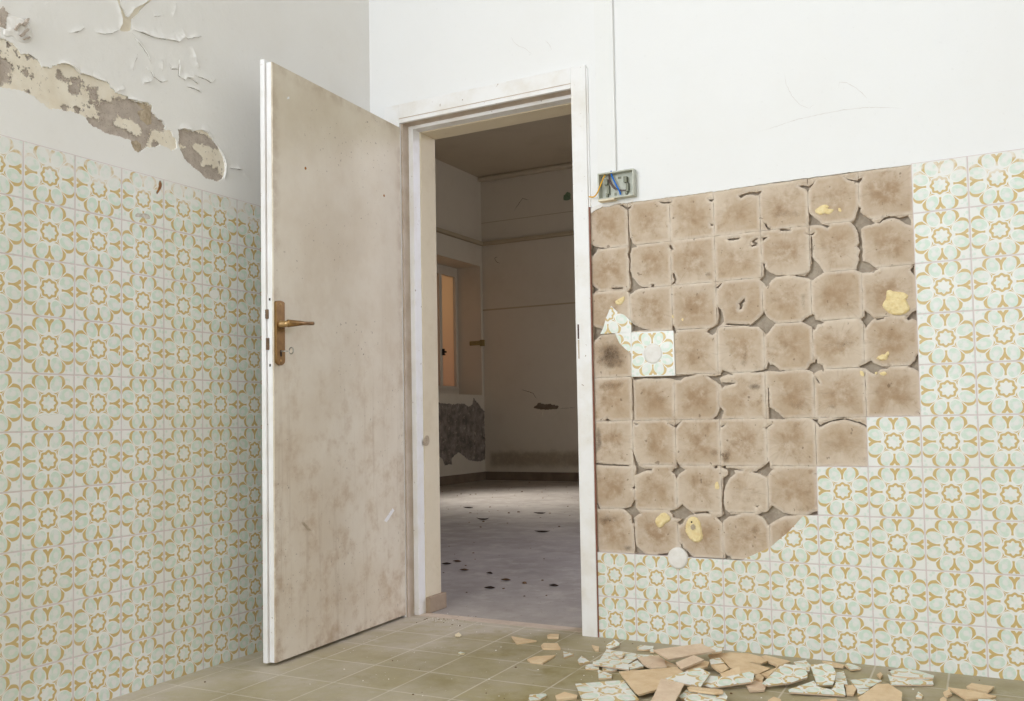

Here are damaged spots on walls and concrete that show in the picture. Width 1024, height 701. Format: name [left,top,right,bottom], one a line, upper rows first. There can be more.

flaking render [0,6,231,184]
spalling [423,398,486,465]
spalling [534,403,560,419]
peeling [590,165,920,560]